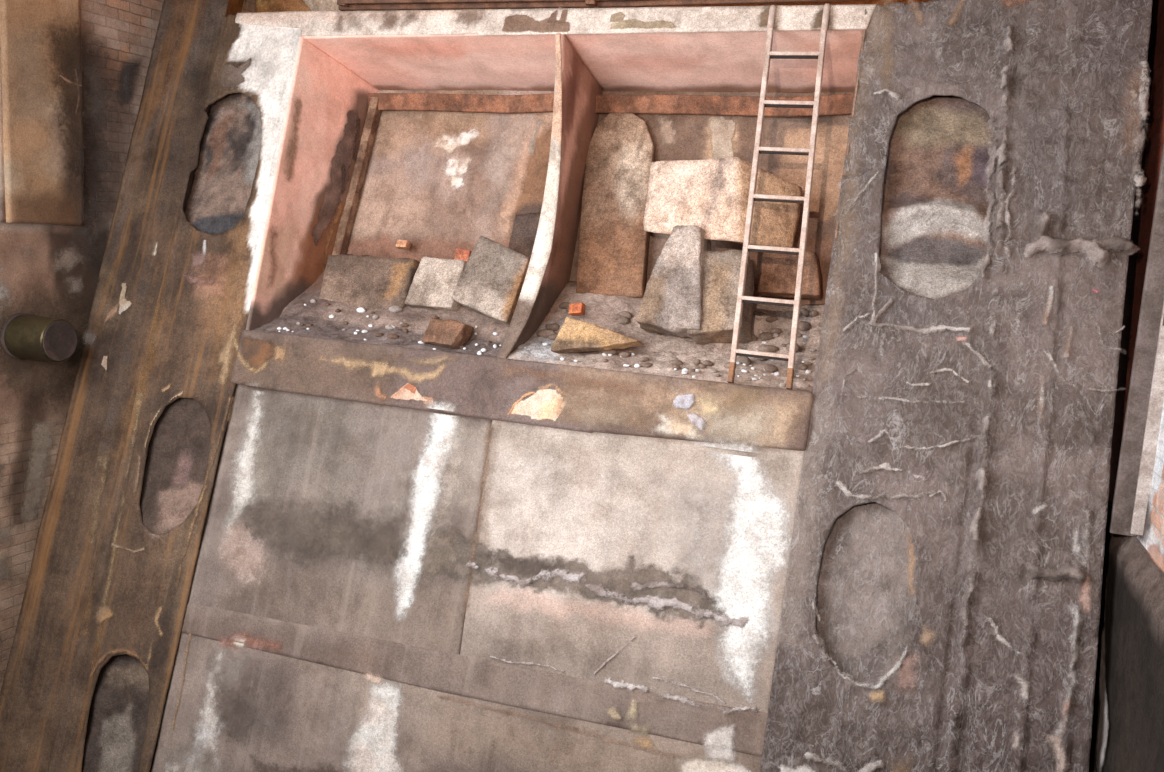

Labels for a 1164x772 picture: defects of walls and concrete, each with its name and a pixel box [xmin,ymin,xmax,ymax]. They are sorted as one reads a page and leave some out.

water stain [407,129,478,188]
water stain [485,116,541,200]
peeling [375,383,434,405]
peeling [507,384,643,425]
peeling [657,394,766,442]
crack [1044,349,1112,392]
water stain [220,390,790,772]